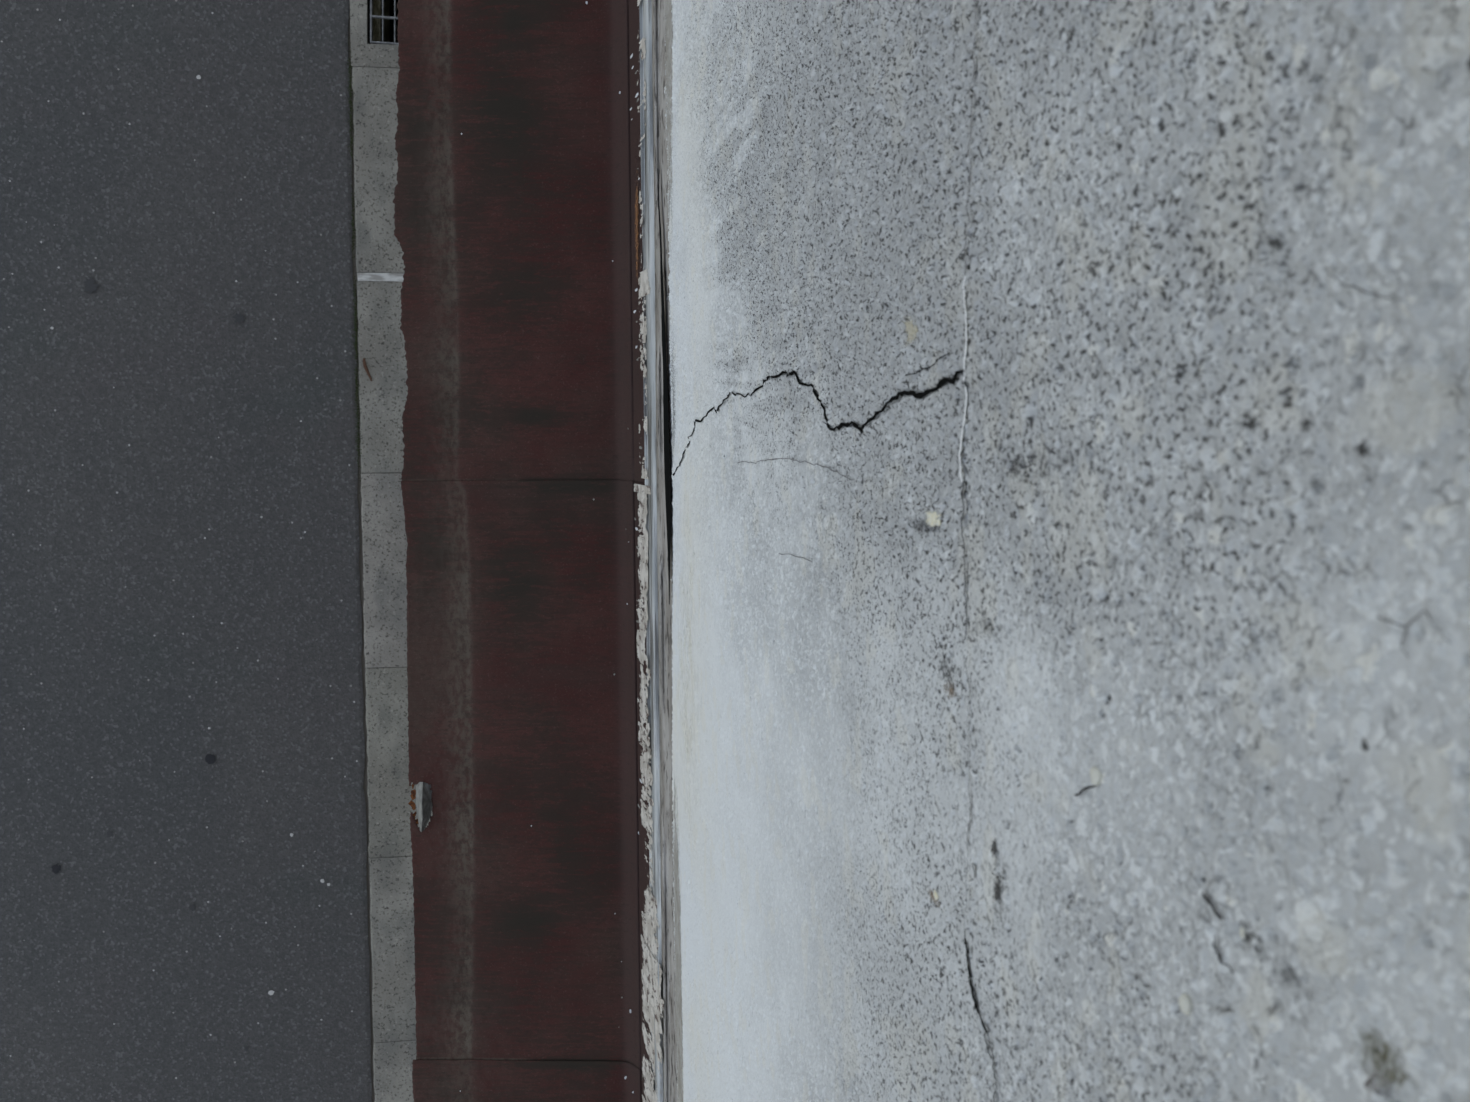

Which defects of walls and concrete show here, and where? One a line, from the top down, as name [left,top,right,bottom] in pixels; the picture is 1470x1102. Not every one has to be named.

crack [657,0,997,1102]